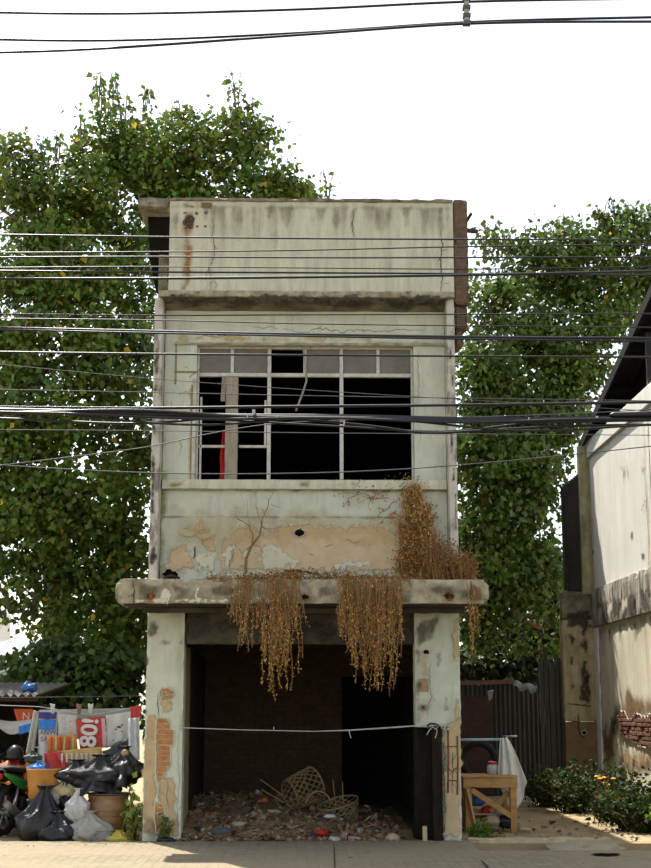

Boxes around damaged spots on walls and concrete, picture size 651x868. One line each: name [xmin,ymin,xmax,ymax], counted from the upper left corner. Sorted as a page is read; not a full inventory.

flaking render [161,513,415,577]
peeling [135,586,238,603]
damp [567,589,651,702]
flaking render [142,686,179,836]
flaking render [617,710,651,751]